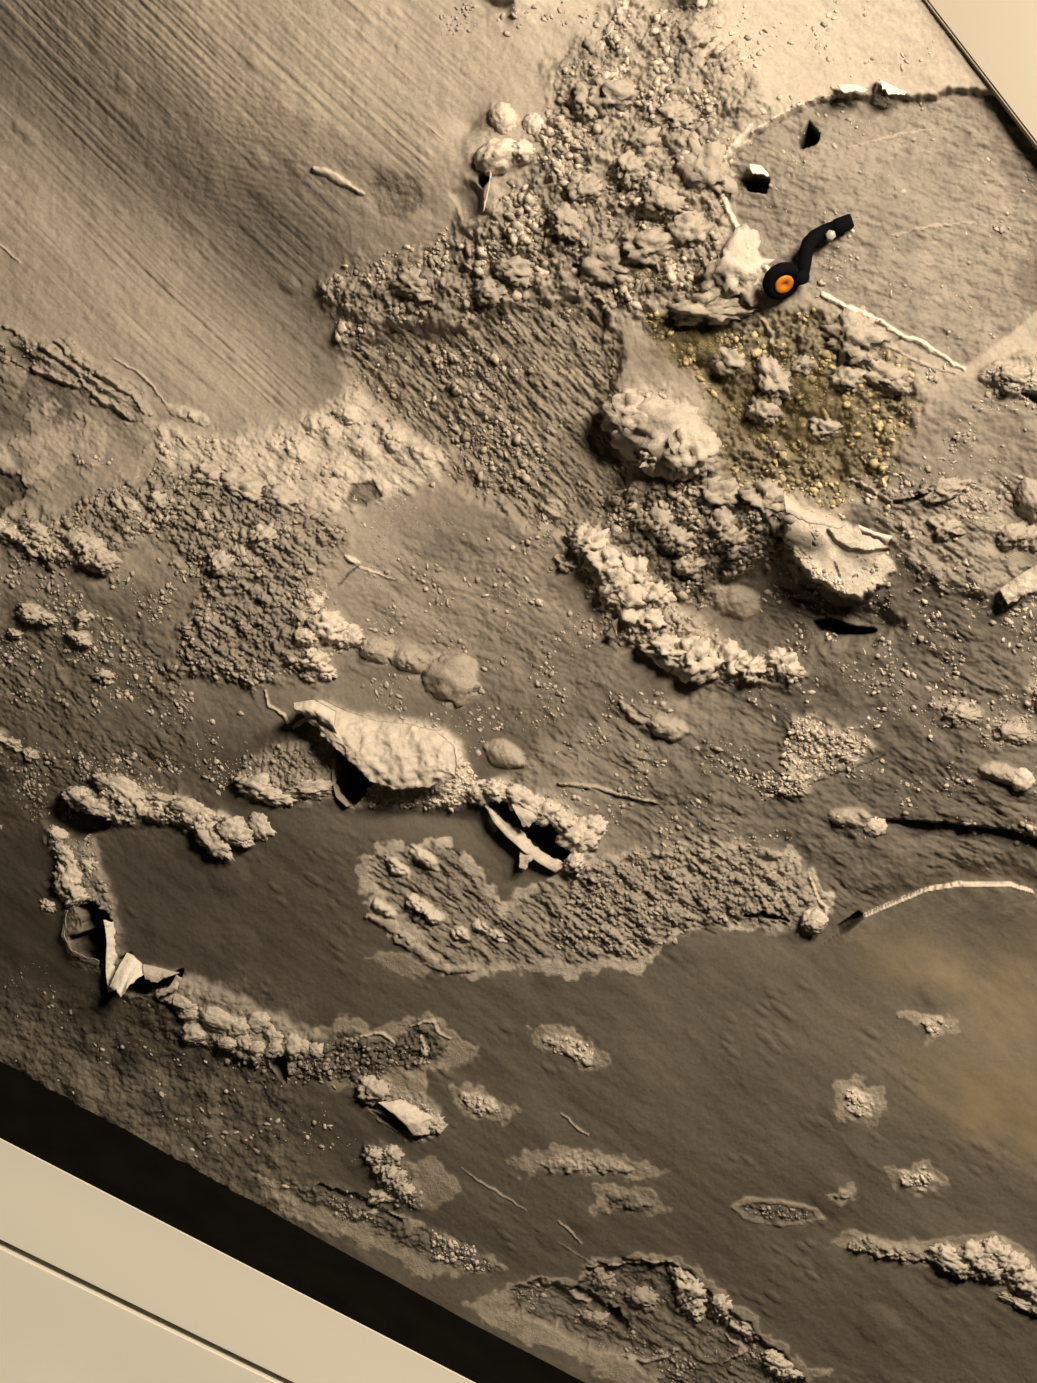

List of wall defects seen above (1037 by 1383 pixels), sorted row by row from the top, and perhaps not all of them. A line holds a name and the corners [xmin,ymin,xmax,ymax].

peeling [0,325,168,423]
flaking render [312,0,1037,687]
flaking render [0,462,1037,1128]
crack [885,818,1037,842]
flaking render [732,1183,856,1228]
flaking render [253,1143,834,1383]
flaking render [831,1231,1037,1317]